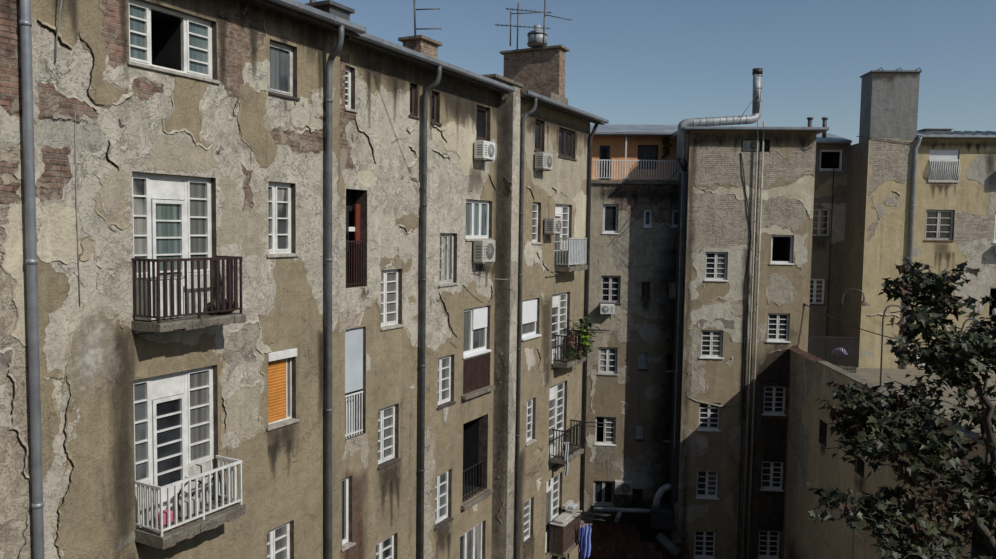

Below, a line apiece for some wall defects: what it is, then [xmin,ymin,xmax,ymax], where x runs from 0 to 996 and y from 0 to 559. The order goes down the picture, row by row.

crack [355,89,376,162]
crack [400,125,450,234]
flaking render [866,138,913,242]
peeling [0,0,497,559]
crack [439,293,458,347]
peeling [495,290,546,405]
peeling [503,97,847,532]
peeling [953,211,996,341]
crack [5,363,32,484]
crack [50,375,76,559]
water stain [269,425,294,469]
peeling [497,421,515,526]